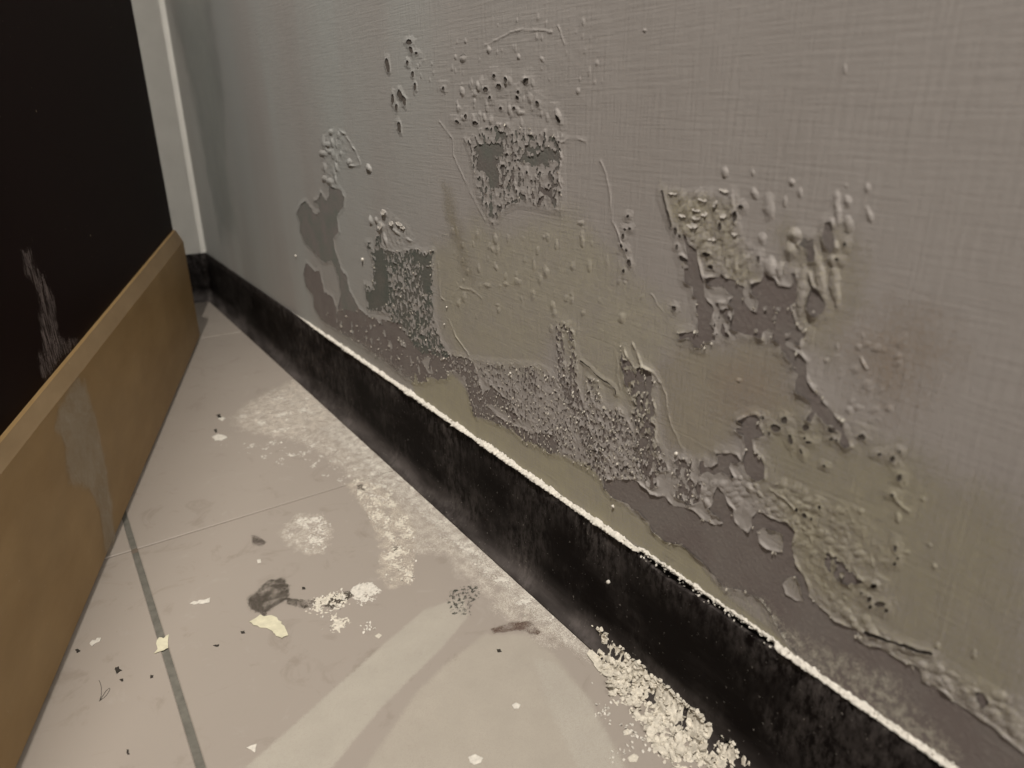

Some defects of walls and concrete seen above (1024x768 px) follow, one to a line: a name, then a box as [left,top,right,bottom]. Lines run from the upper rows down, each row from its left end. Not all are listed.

peeling [438,71,588,228]
peeling [598,157,637,275]
peeling [295,184,1024,768]
damp [325,175,1024,765]